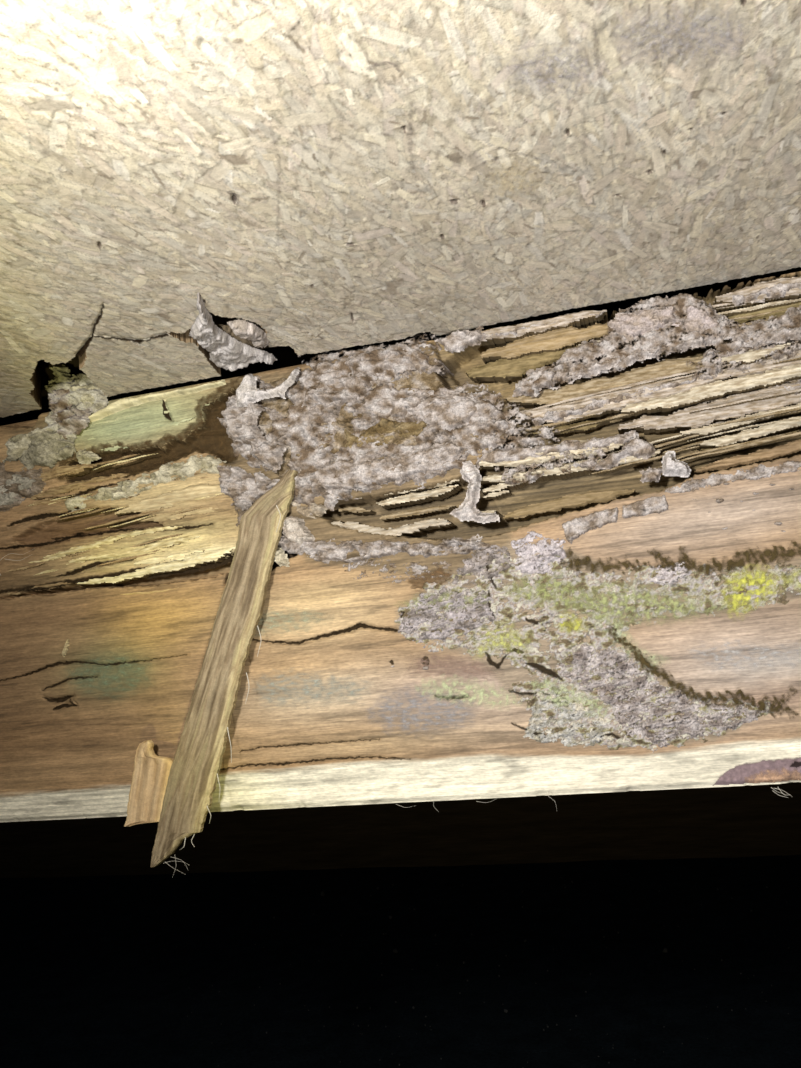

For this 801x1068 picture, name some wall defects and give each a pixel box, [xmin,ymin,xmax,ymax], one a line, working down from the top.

crack [77,305,169,357]
crack [0,479,144,549]
crack [173,522,213,530]
crack [0,551,234,594]
damp [394,541,801,753]